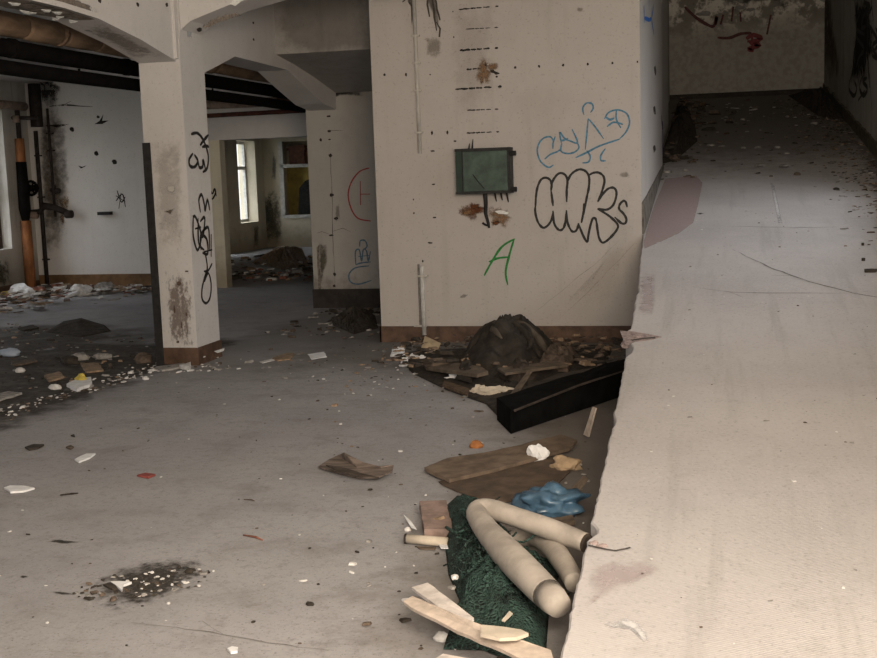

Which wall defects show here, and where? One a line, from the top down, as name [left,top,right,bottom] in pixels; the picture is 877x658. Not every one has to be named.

flaking render [455,64,502,90]